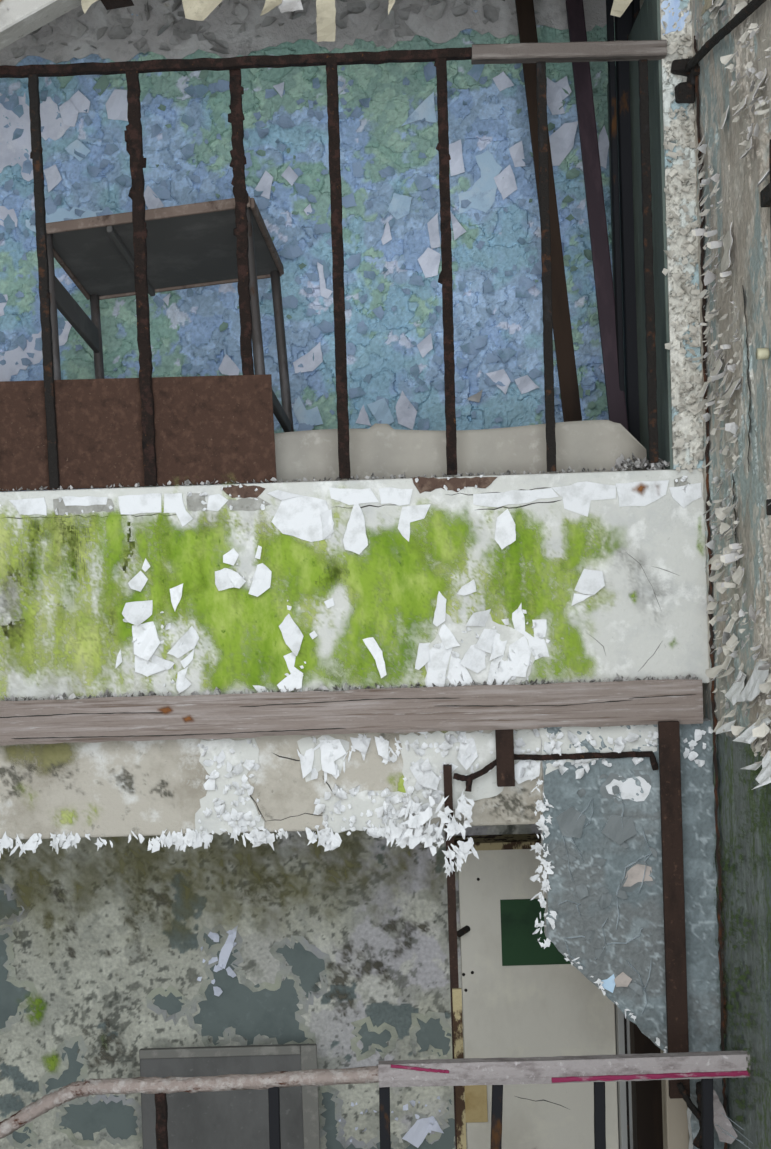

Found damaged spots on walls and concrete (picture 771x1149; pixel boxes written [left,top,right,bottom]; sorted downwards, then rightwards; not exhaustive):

peeling [0,0,519,66]
peeling [533,0,568,30]
peeling [583,0,633,32]
peeling [0,75,771,790]
leakage [0,843,93,910]
peeling [0,831,113,858]
leakage [106,833,308,929]
leakage [310,830,366,886]
peeling [128,724,658,949]
leakage [323,920,429,1016]
peeling [564,953,636,1021]
leakage [90,1019,131,1067]